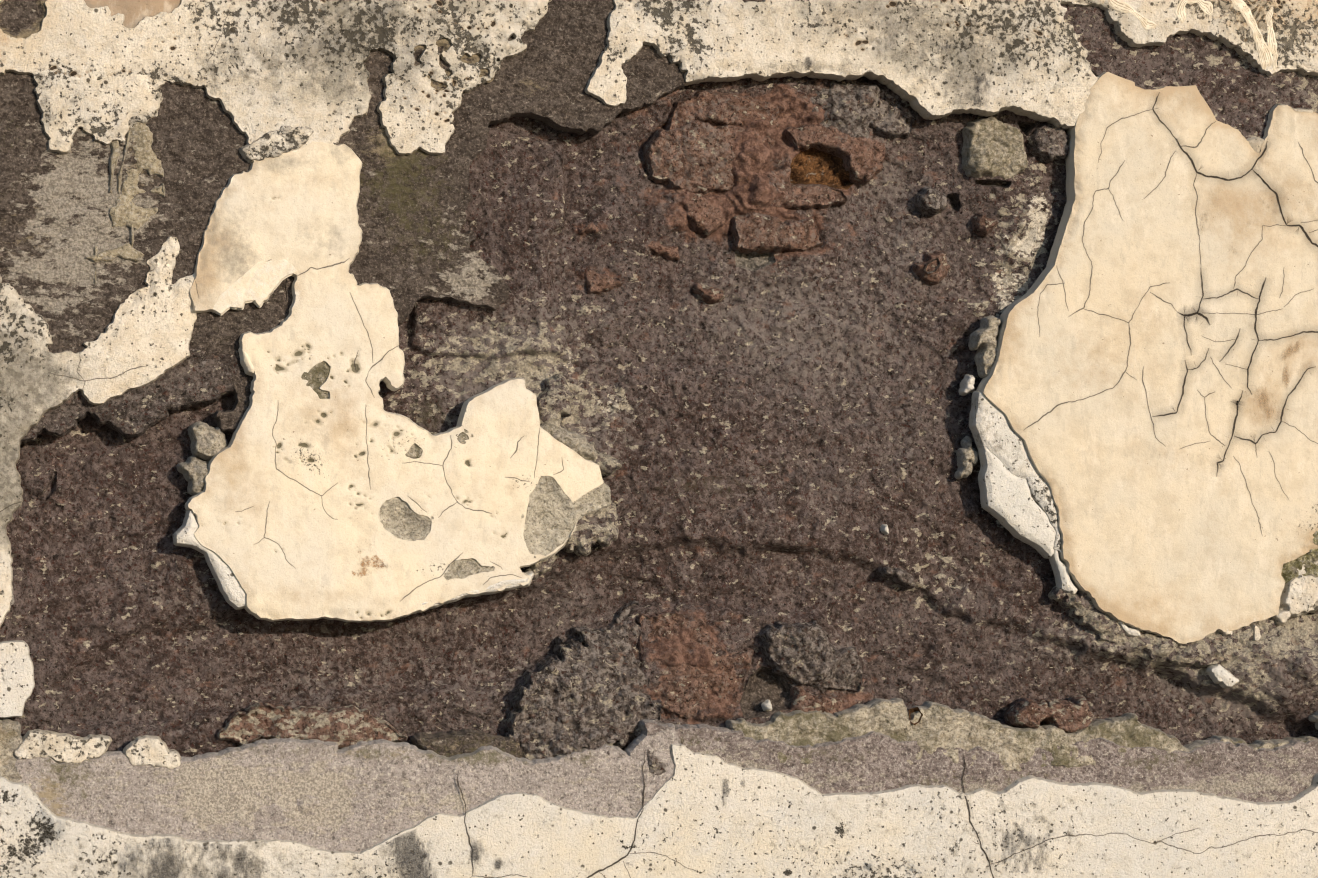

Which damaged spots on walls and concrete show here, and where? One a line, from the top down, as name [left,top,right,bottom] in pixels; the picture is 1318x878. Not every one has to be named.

spalling [0,0,47,38]
peeling [336,0,686,326]
crack [1027,94,1318,533]
crack [272,412,336,519]
crack [351,296,396,481]
crack [407,440,489,516]
crack [508,430,564,481]
spalling [0,72,1318,757]
peeling [15,689,744,852]
spalling [725,698,1208,771]
peeling [674,724,1318,802]
crack [962,755,1318,878]